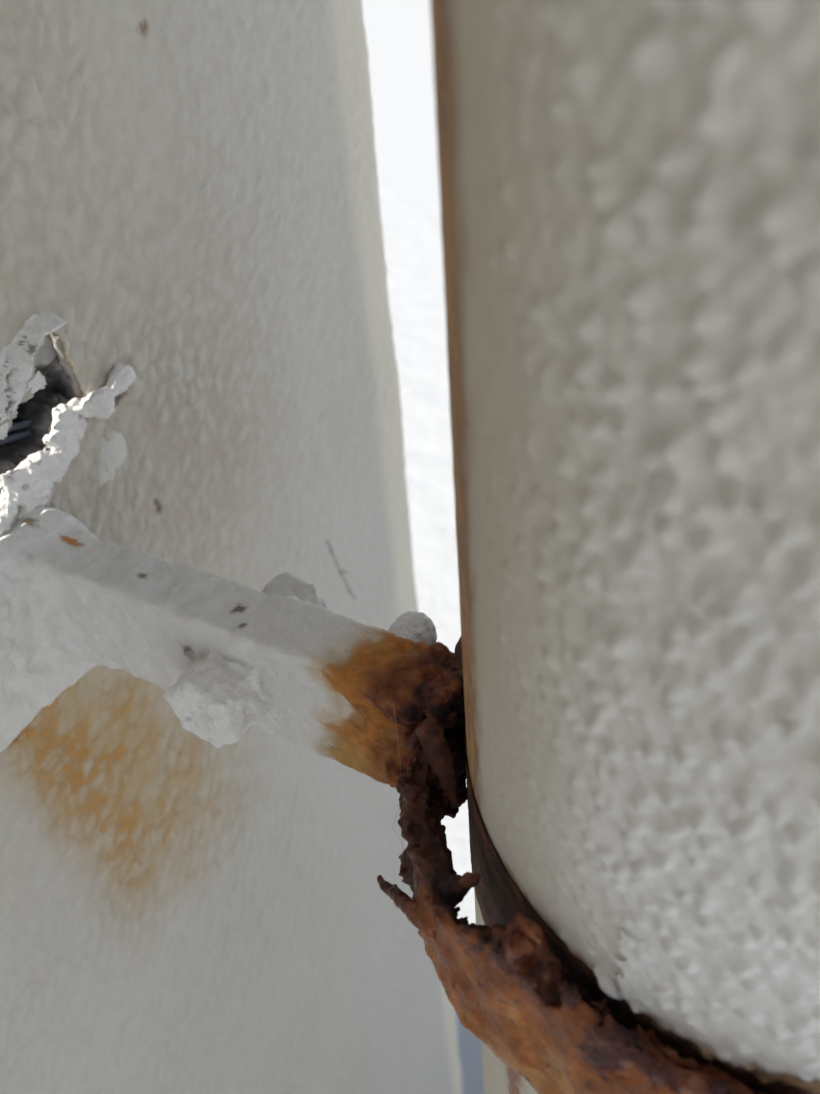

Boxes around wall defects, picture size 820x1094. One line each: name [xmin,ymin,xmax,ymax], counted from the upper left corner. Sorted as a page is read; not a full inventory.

rust [15,697,137,845]
rust [321,630,437,784]
rust [703,1047,820,1094]